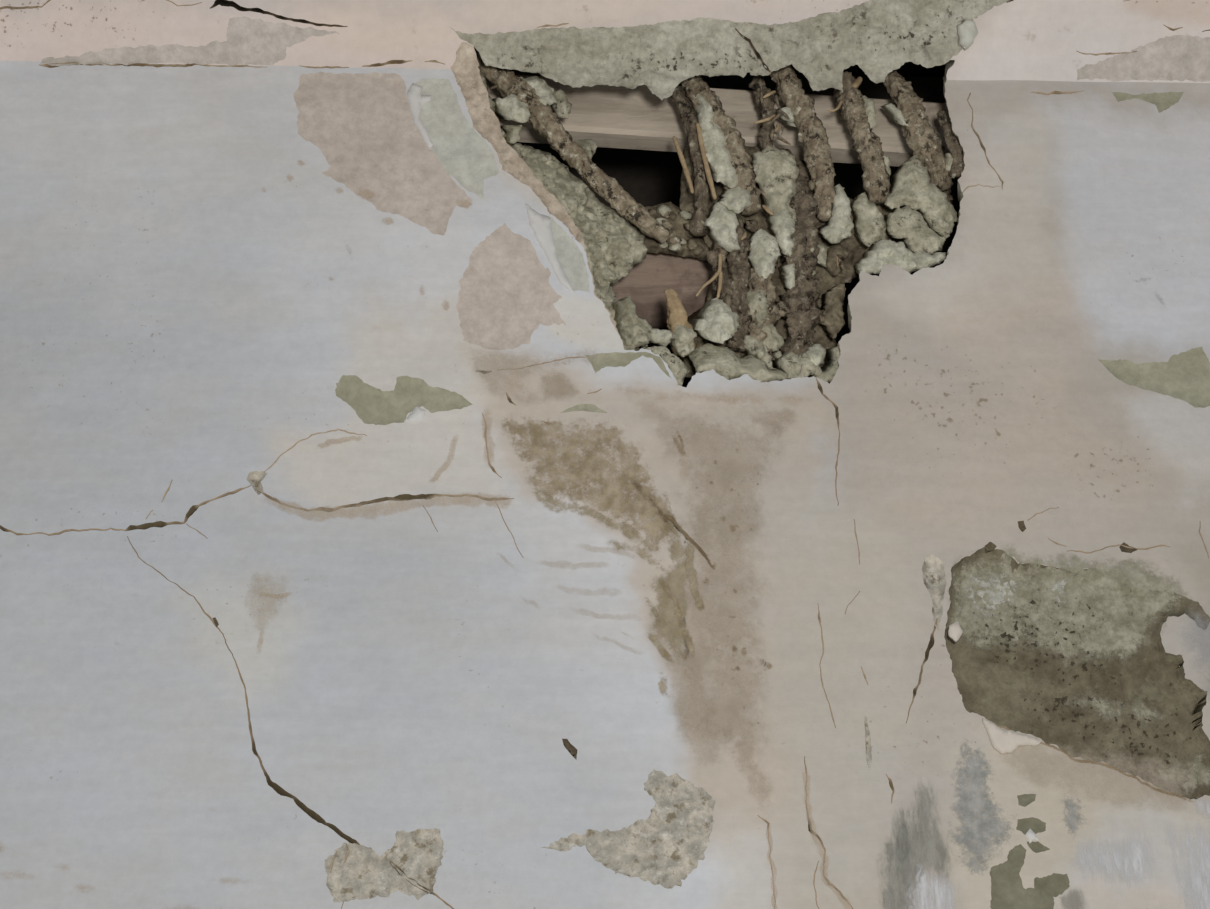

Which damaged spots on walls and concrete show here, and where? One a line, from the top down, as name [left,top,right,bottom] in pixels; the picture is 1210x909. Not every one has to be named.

crack [0,0,51,10]
crack [142,0,348,27]
flaking render [293,0,1010,382]
peeling [335,375,473,425]
crack [0,357,586,878]
damp [504,421,760,734]
flaking render [922,542,1210,799]
flaking render [540,769,716,889]
crack [804,757,853,909]
mould [884,748,1009,909]
peeling [990,794,1070,909]
damp [1062,892,1082,909]